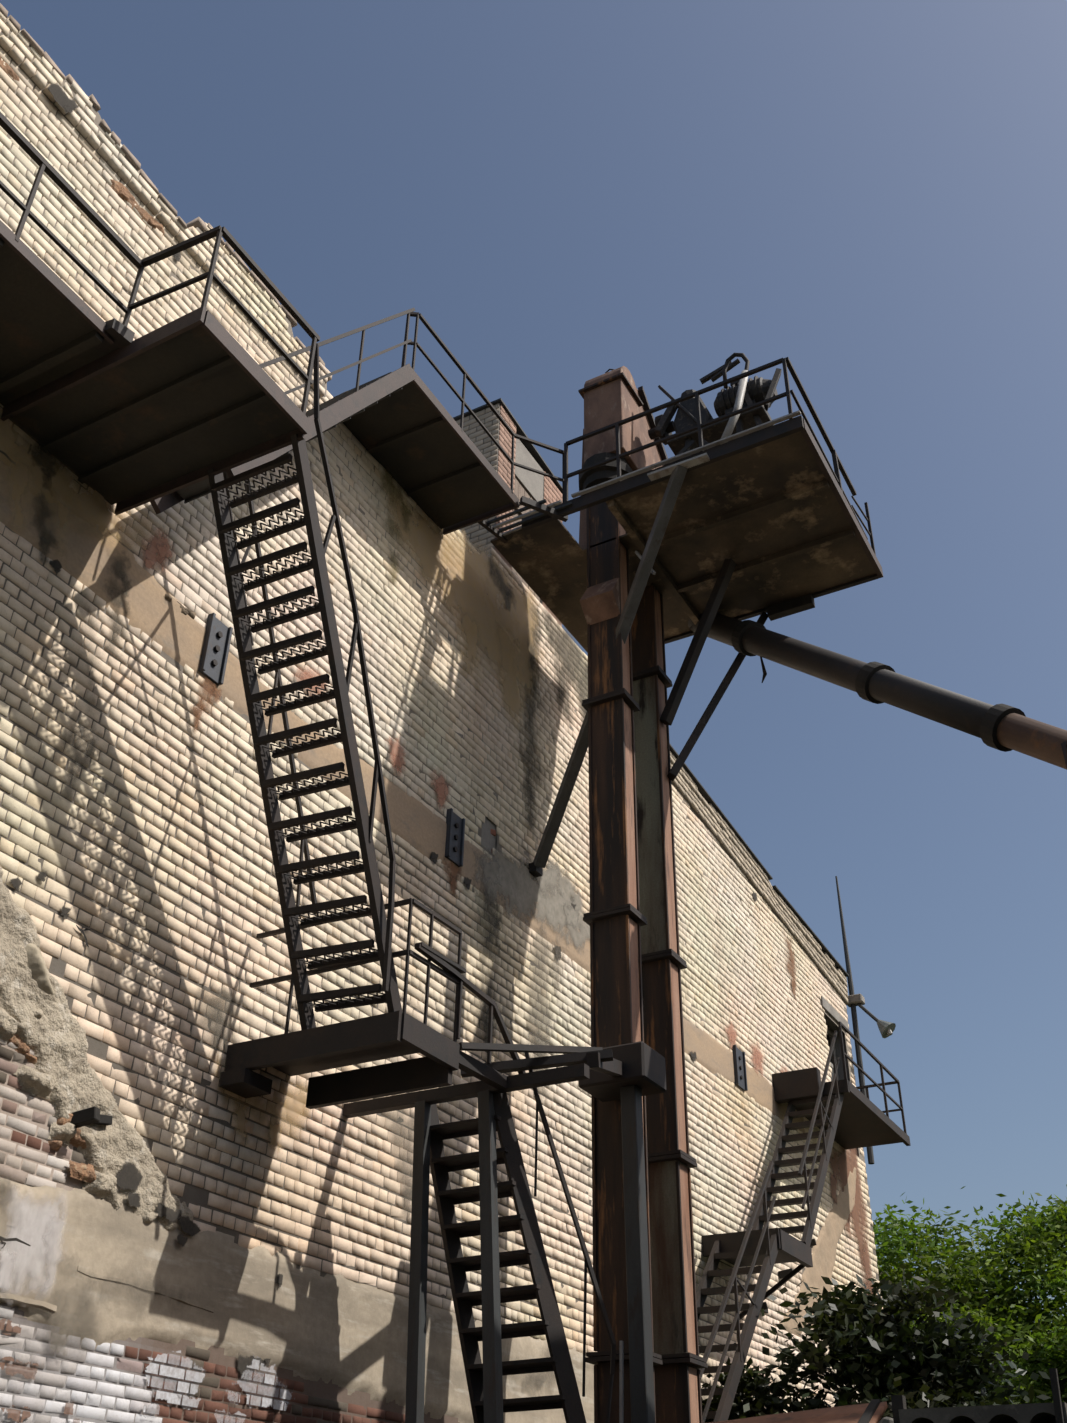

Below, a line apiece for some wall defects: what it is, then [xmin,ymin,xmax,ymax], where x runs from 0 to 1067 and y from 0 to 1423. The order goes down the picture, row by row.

water stain [0,412,117,562]
water stain [109,560,129,640]
water stain [398,503,588,828]
water stain [483,897,500,954]
water stain [482,976,495,1062]
spalling [7,1034,37,1064]
spalling [48,1113,96,1183]
crack [0,1236,31,1249]
peeling [128,1193,140,1207]
peeling [157,1203,187,1246]
spalling [238,1355,270,1382]
peeling [178,1394,201,1411]